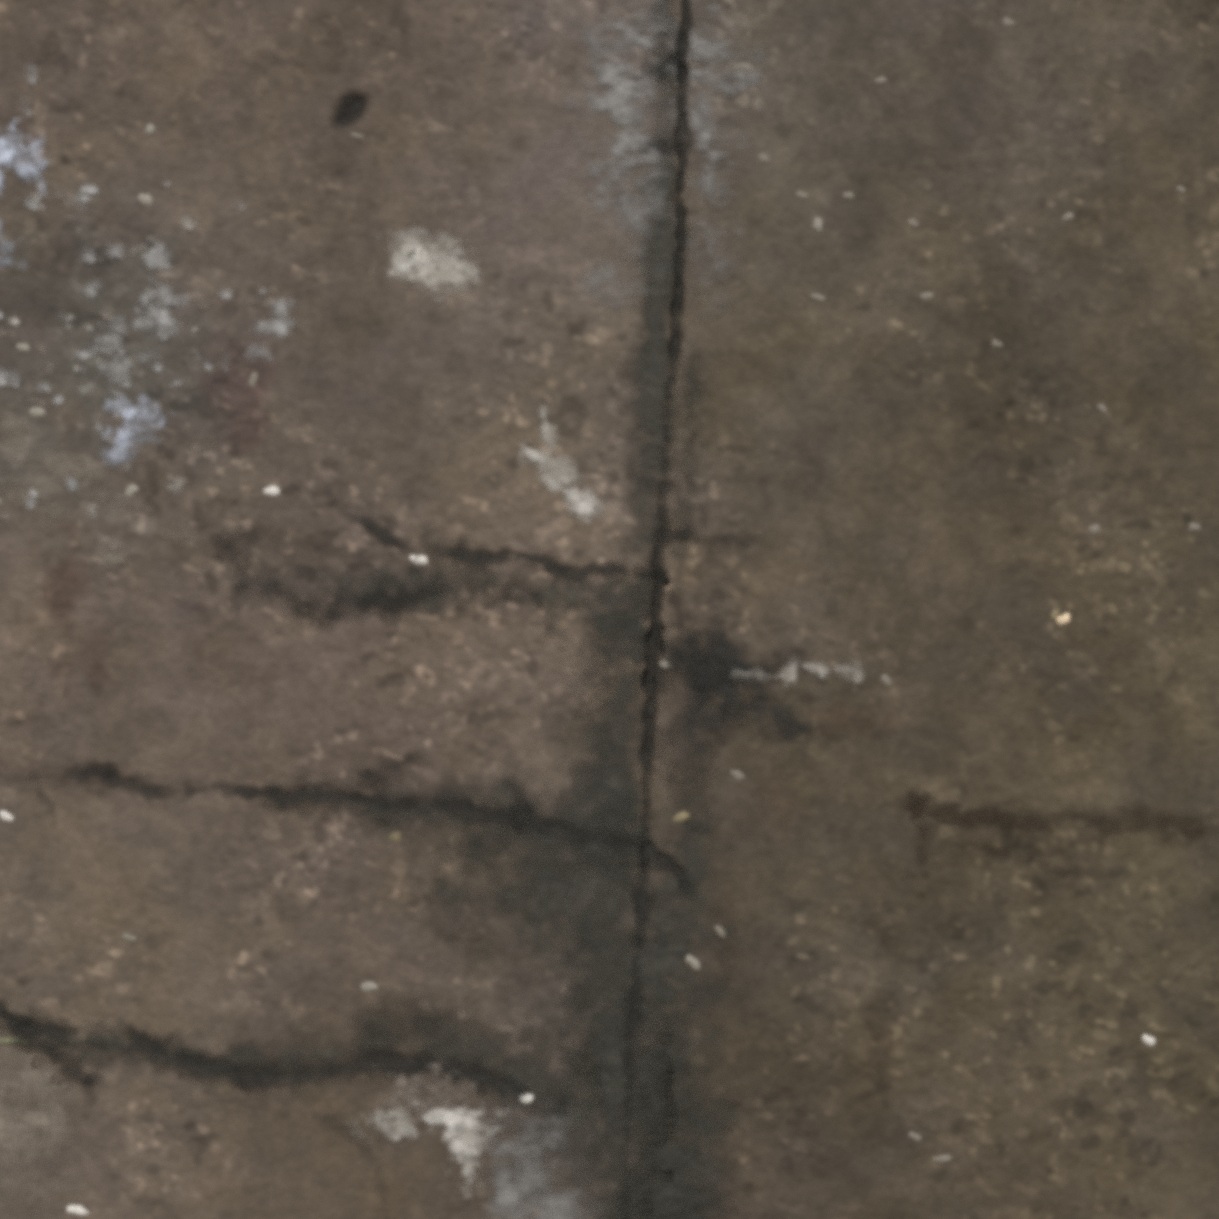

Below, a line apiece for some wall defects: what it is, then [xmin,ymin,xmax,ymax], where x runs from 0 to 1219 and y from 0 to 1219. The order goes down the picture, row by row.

damp [390,231,477,291]
damp [589,23,679,551]
crack [648,0,690,381]
crack [67,435,692,940]
damp [672,623,806,738]
crack [0,1003,96,1082]
crack [128,1027,522,1093]
damp [424,573,733,1219]